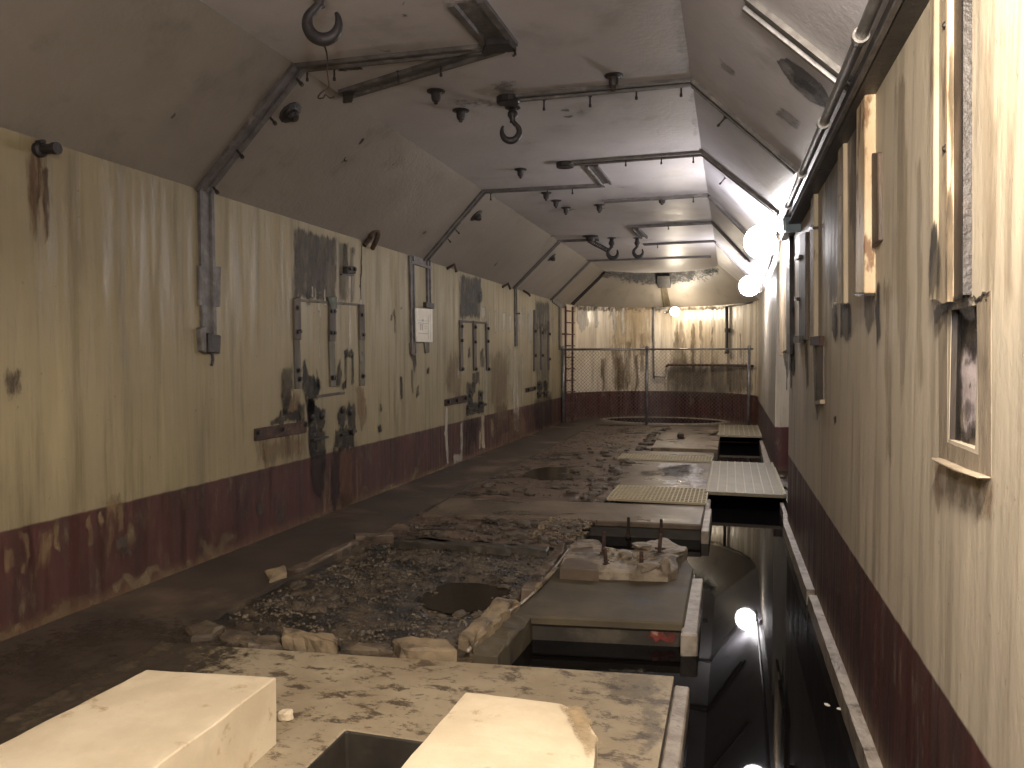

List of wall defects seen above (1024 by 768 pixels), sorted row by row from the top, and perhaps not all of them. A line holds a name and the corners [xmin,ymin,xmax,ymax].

water stain [777,58,829,108]
rust [29,151,49,238]
water stain [576,305,753,401]
water stain [271,360,397,511]